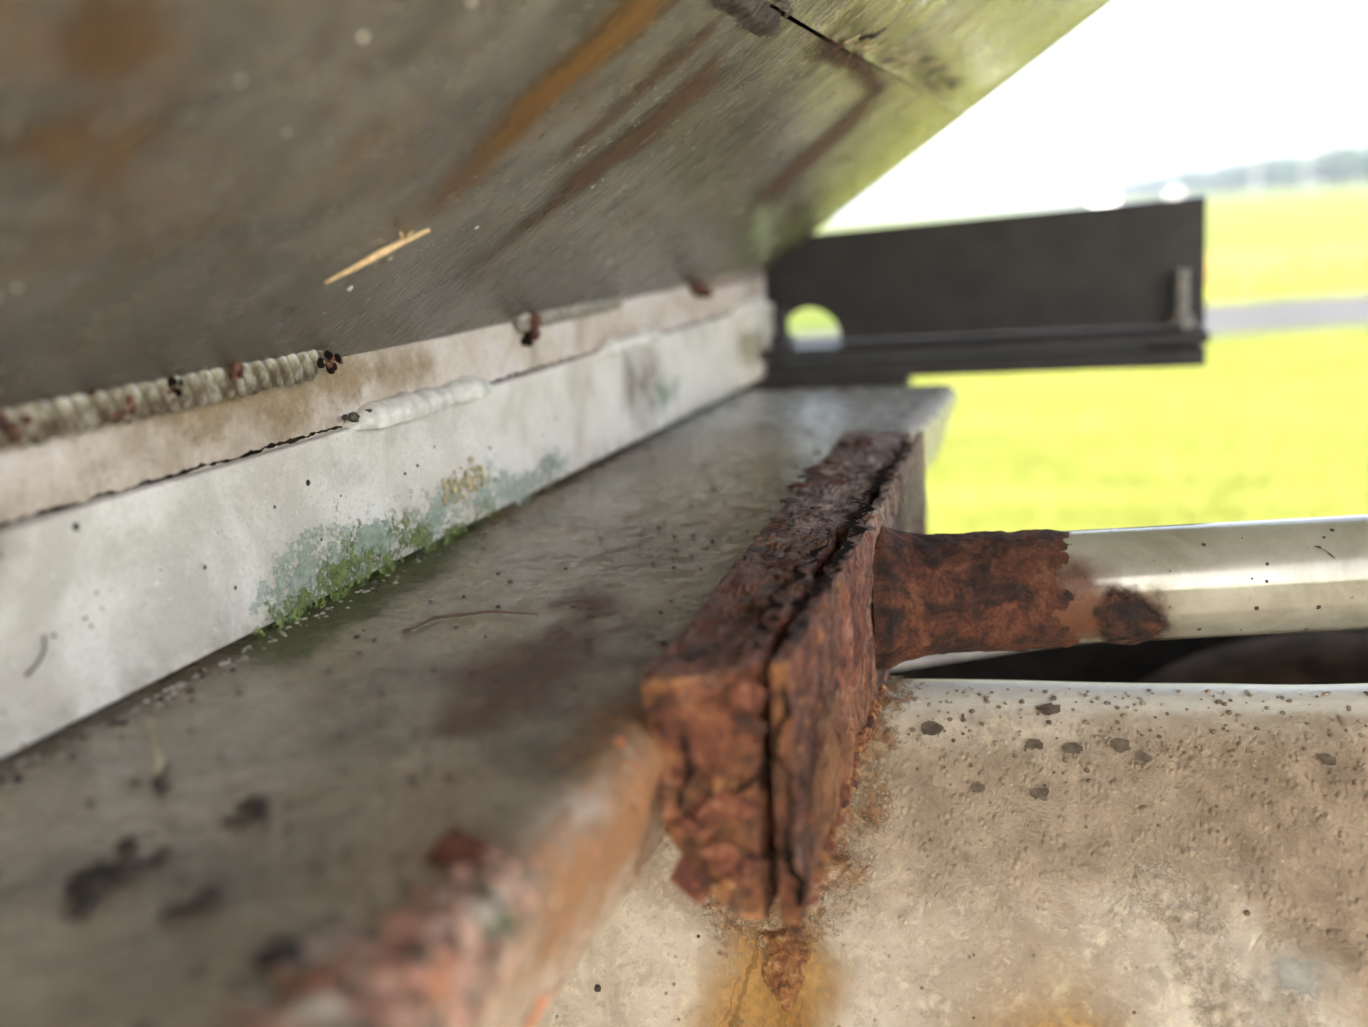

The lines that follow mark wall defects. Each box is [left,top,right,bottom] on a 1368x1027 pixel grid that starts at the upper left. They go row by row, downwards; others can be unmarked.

corrosion [457,0,669,183]
corrosion [656,432,927,1027]